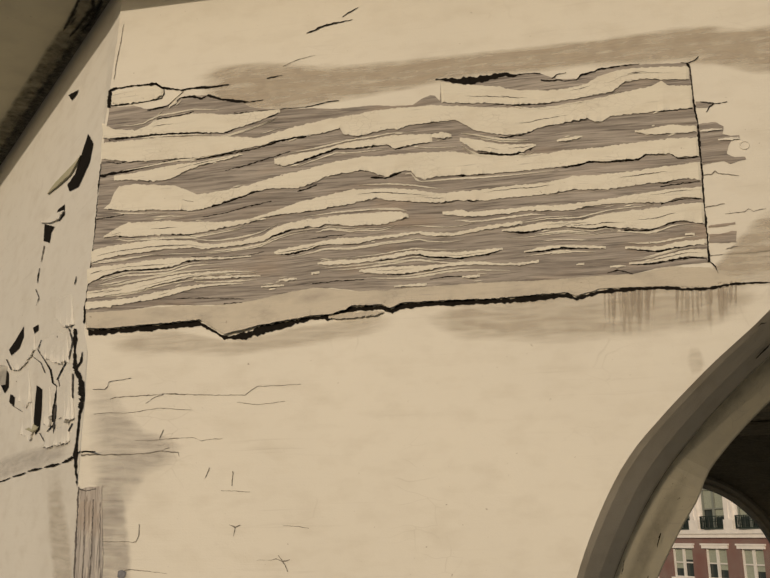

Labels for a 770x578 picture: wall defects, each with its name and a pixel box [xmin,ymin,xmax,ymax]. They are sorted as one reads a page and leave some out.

damp [0,0,110,165]
damp [215,29,770,107]
peeling [85,63,746,313]
crack [0,56,770,486]
peeling [6,295,75,448]
peeling [73,486,103,578]